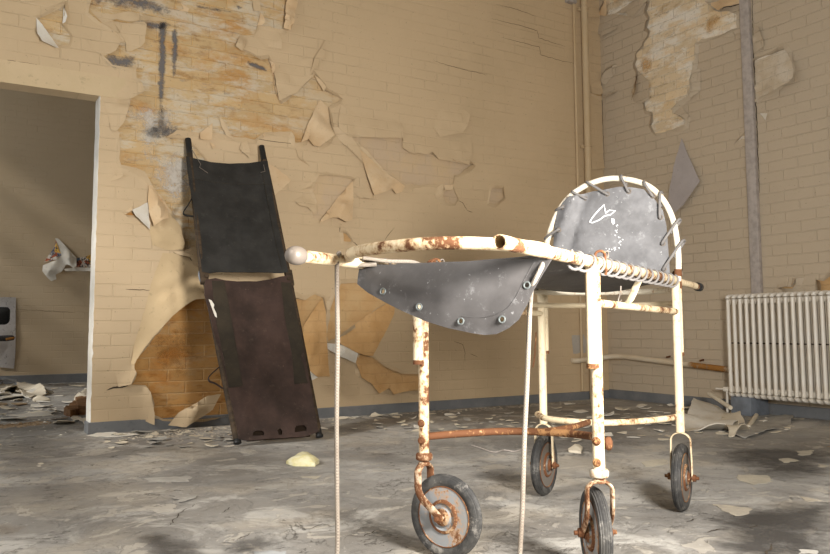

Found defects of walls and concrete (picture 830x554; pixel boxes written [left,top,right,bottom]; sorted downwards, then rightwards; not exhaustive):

peeling [33,0,74,50]
leakage [113,0,163,11]
leakage [107,55,133,67]
leakage [148,22,177,101]
peeling [753,25,795,102]
leakage [141,110,175,144]
peeling [599,0,740,213]
leakage [158,159,187,197]
peeling [85,0,476,449]